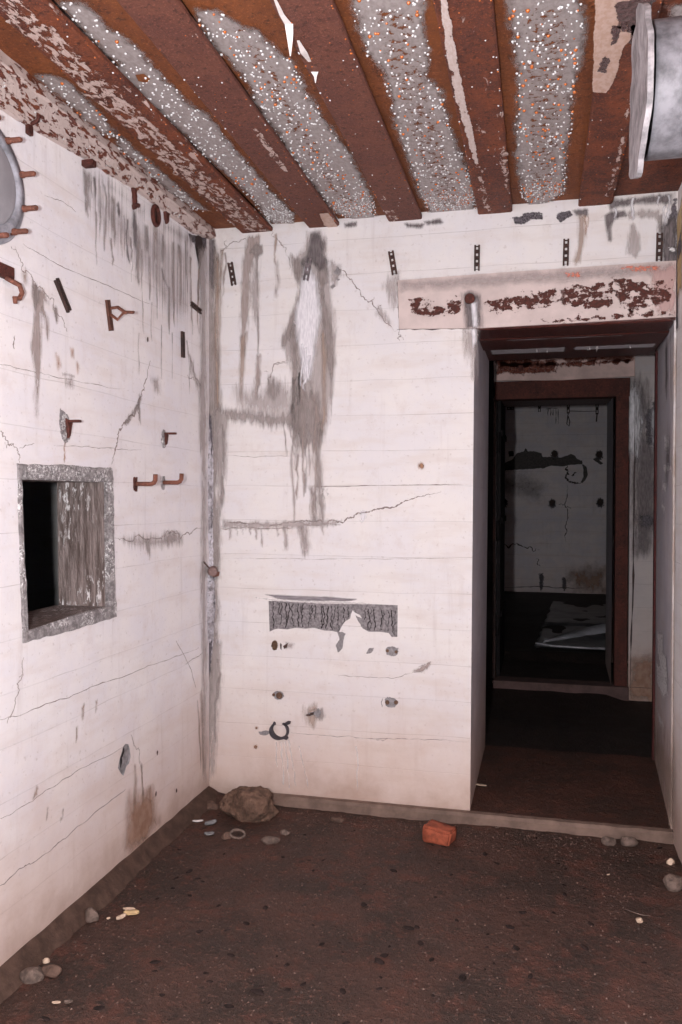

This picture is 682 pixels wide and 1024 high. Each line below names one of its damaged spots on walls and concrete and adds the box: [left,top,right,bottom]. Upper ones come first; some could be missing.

rust [597,0,656,73]
rust [151,204,161,227]
leakage [606,194,682,329]
leakage [24,275,48,394]
rust [408,295,461,317]
rust [484,277,673,324]
crack [1,363,158,463]
leakage [85,176,334,768]
crack [119,484,467,560]
flaking render [269,601,398,652]
crack [1,641,202,723]
spalling [118,744,131,776]